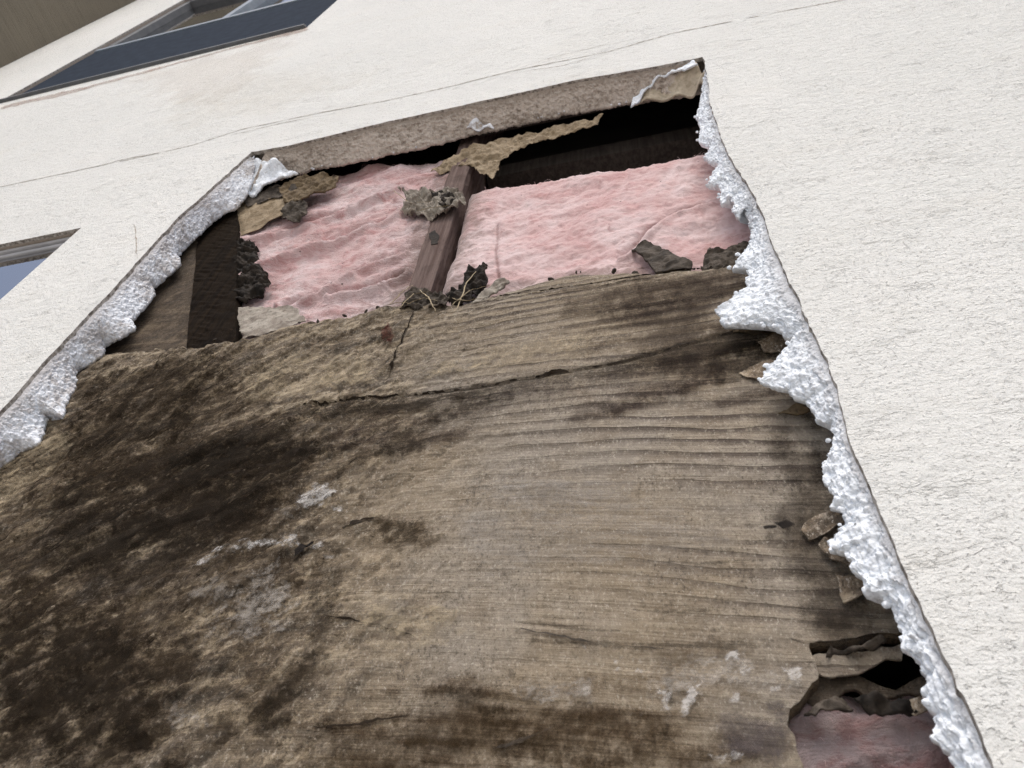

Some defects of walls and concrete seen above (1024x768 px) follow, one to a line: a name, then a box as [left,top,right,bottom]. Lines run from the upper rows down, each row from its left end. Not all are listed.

peeling [466,118,494,132]
spalling [0,156,299,469]
crack [274,306,695,419]
spalling [610,60,991,768]